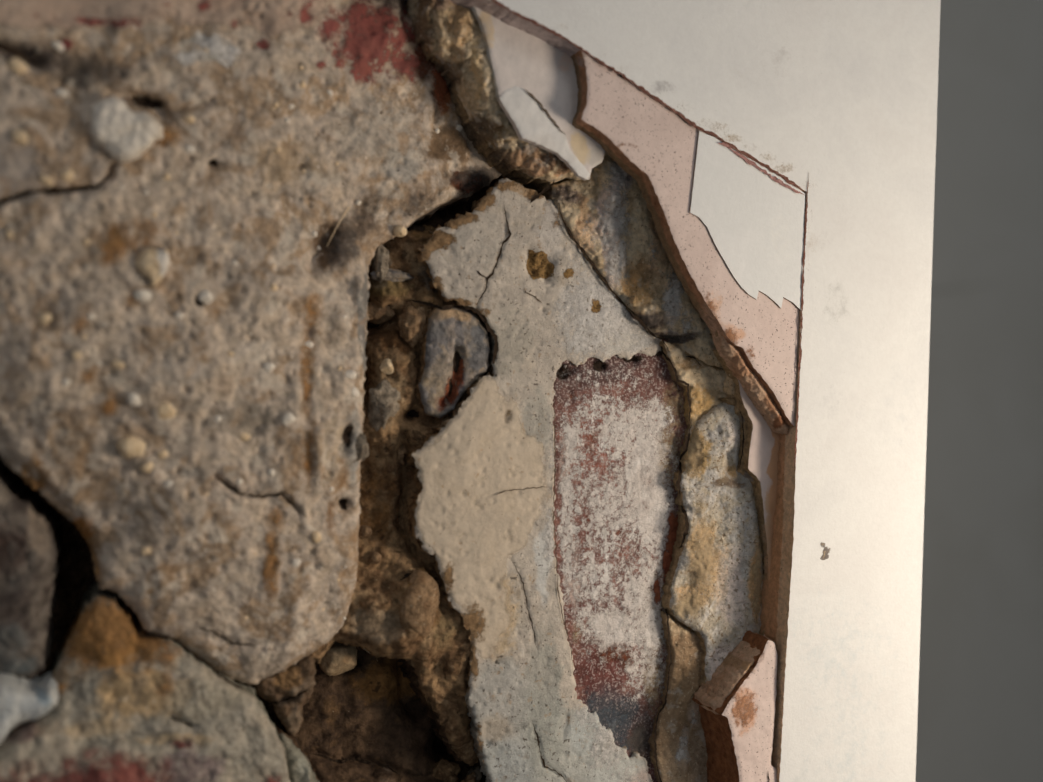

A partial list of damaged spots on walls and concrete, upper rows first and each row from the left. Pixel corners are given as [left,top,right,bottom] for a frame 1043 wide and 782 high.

flaking render [471,6,605,180]
crack [0,167,113,205]
crack [406,206,511,372]
spalling [526,250,574,280]
crack [367,321,382,329]
spalling [593,360,607,372]
crack [530,181,744,548]
crack [216,477,296,509]
peeling [624,462,678,574]
peeling [589,600,668,658]
spalling [732,693,758,727]
crack [533,724,566,781]